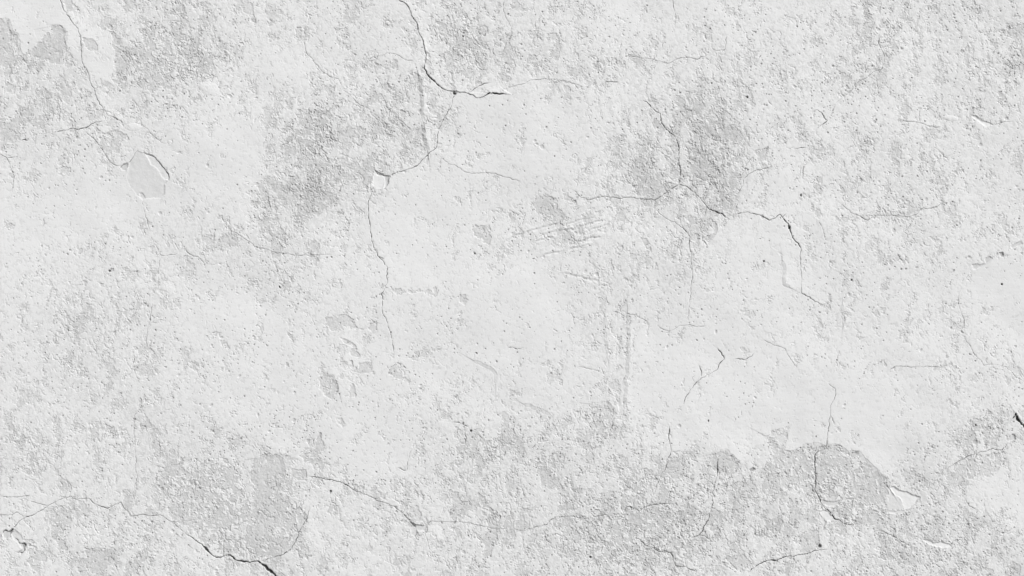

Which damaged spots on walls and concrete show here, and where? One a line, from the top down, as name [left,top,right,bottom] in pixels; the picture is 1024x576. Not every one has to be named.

crack [371,0,578,175]
spalling [99,130,170,200]
crack [368,193,394,350]
crack [575,100,820,331]
crack [2,435,309,576]
peeling [710,453,756,478]
peeling [767,427,920,554]